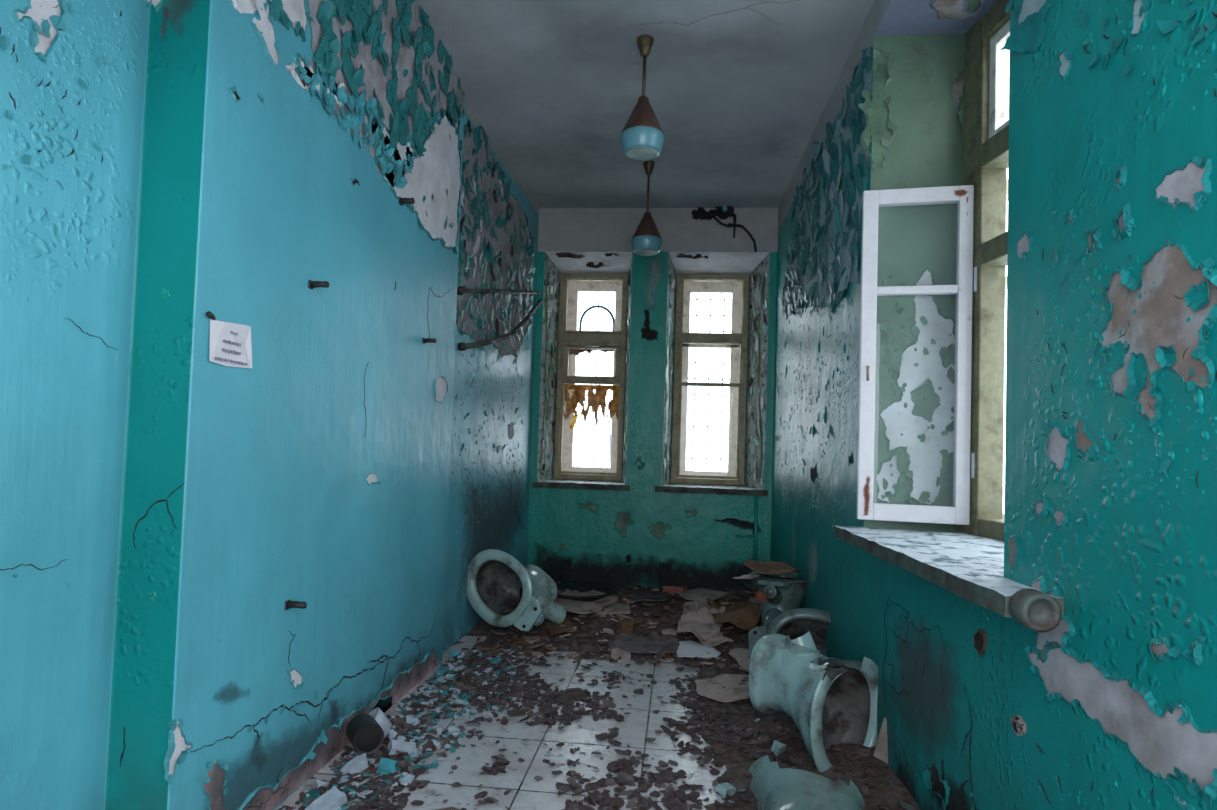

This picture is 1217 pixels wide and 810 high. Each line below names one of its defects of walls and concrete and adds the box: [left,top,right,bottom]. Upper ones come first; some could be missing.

peeling [13,0,68,62]
peeling [232,0,621,479]
peeling [746,46,899,485]
peeling [875,268,956,505]
peeling [1094,237,1217,433]
peeling [1153,156,1212,212]
crack [0,559,67,571]
leakage [538,550,754,614]
crack [245,768,299,810]
crack [176,624,435,764]
spalling [202,649,440,810]
peeling [1024,613,1217,810]